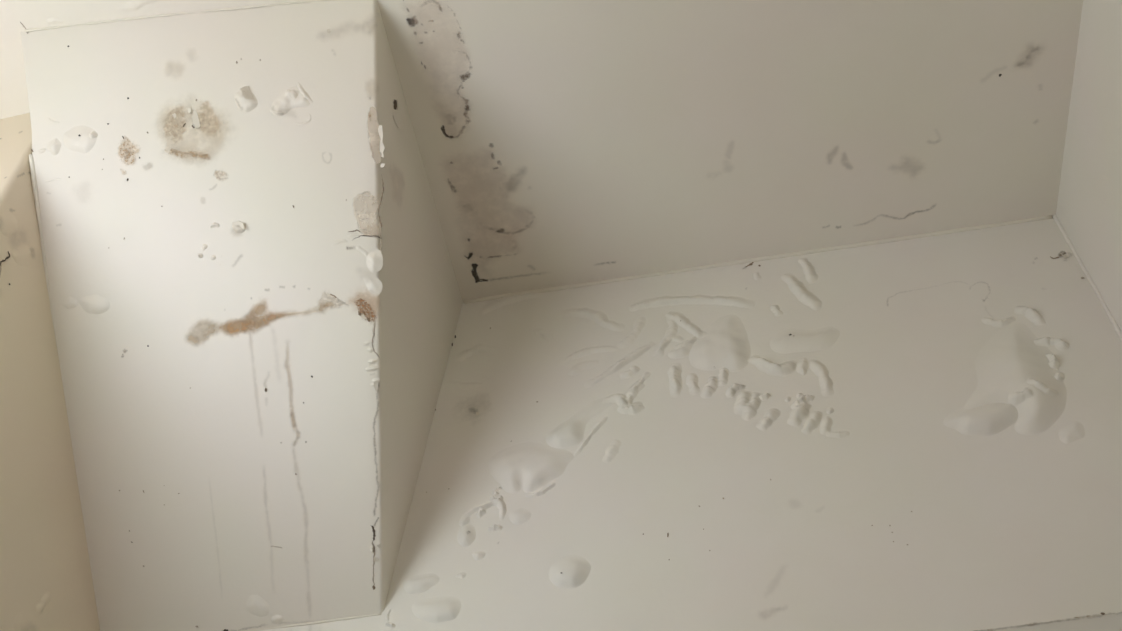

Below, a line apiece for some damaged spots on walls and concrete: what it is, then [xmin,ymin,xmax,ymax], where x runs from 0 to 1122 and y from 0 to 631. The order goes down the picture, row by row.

leakage [467,253,488,283]
corrosion [227,306,276,333]
corrosion [355,299,376,322]
crack [369,525,380,590]